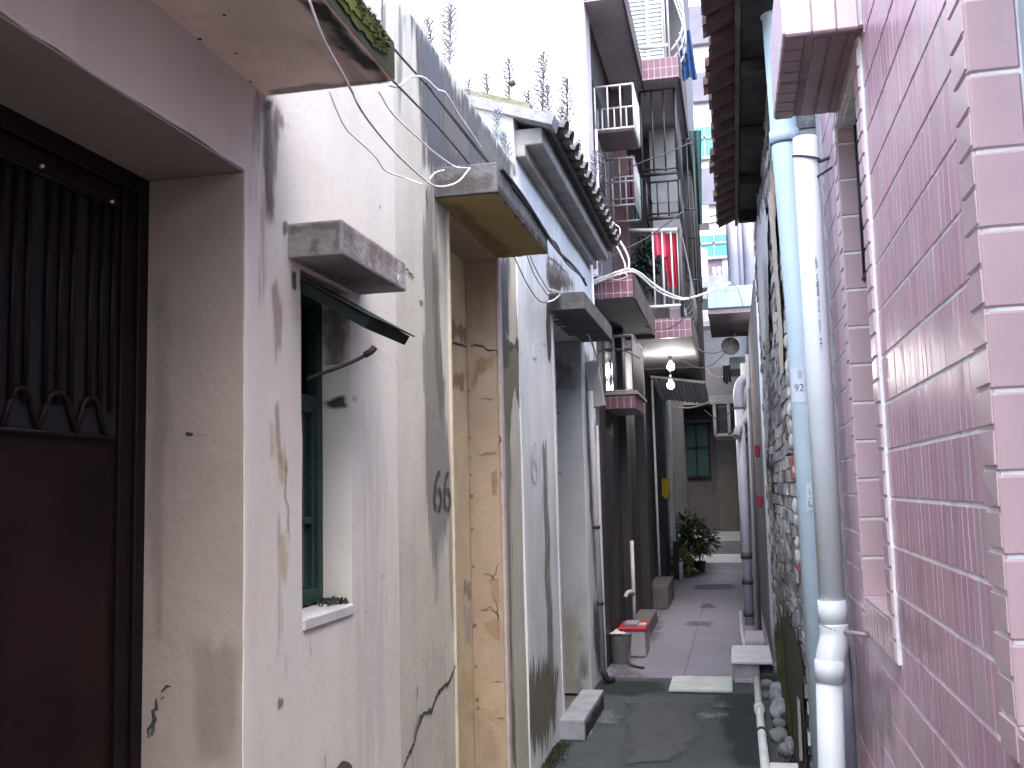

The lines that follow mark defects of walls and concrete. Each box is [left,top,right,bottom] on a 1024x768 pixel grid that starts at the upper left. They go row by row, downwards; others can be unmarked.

leakage [264,1,386,234]
leakage [399,10,575,558]
crack [452,342,498,354]
crack [482,564,501,633]
leakage [529,444,559,758]
crack [147,685,171,738]
crack [404,666,456,767]